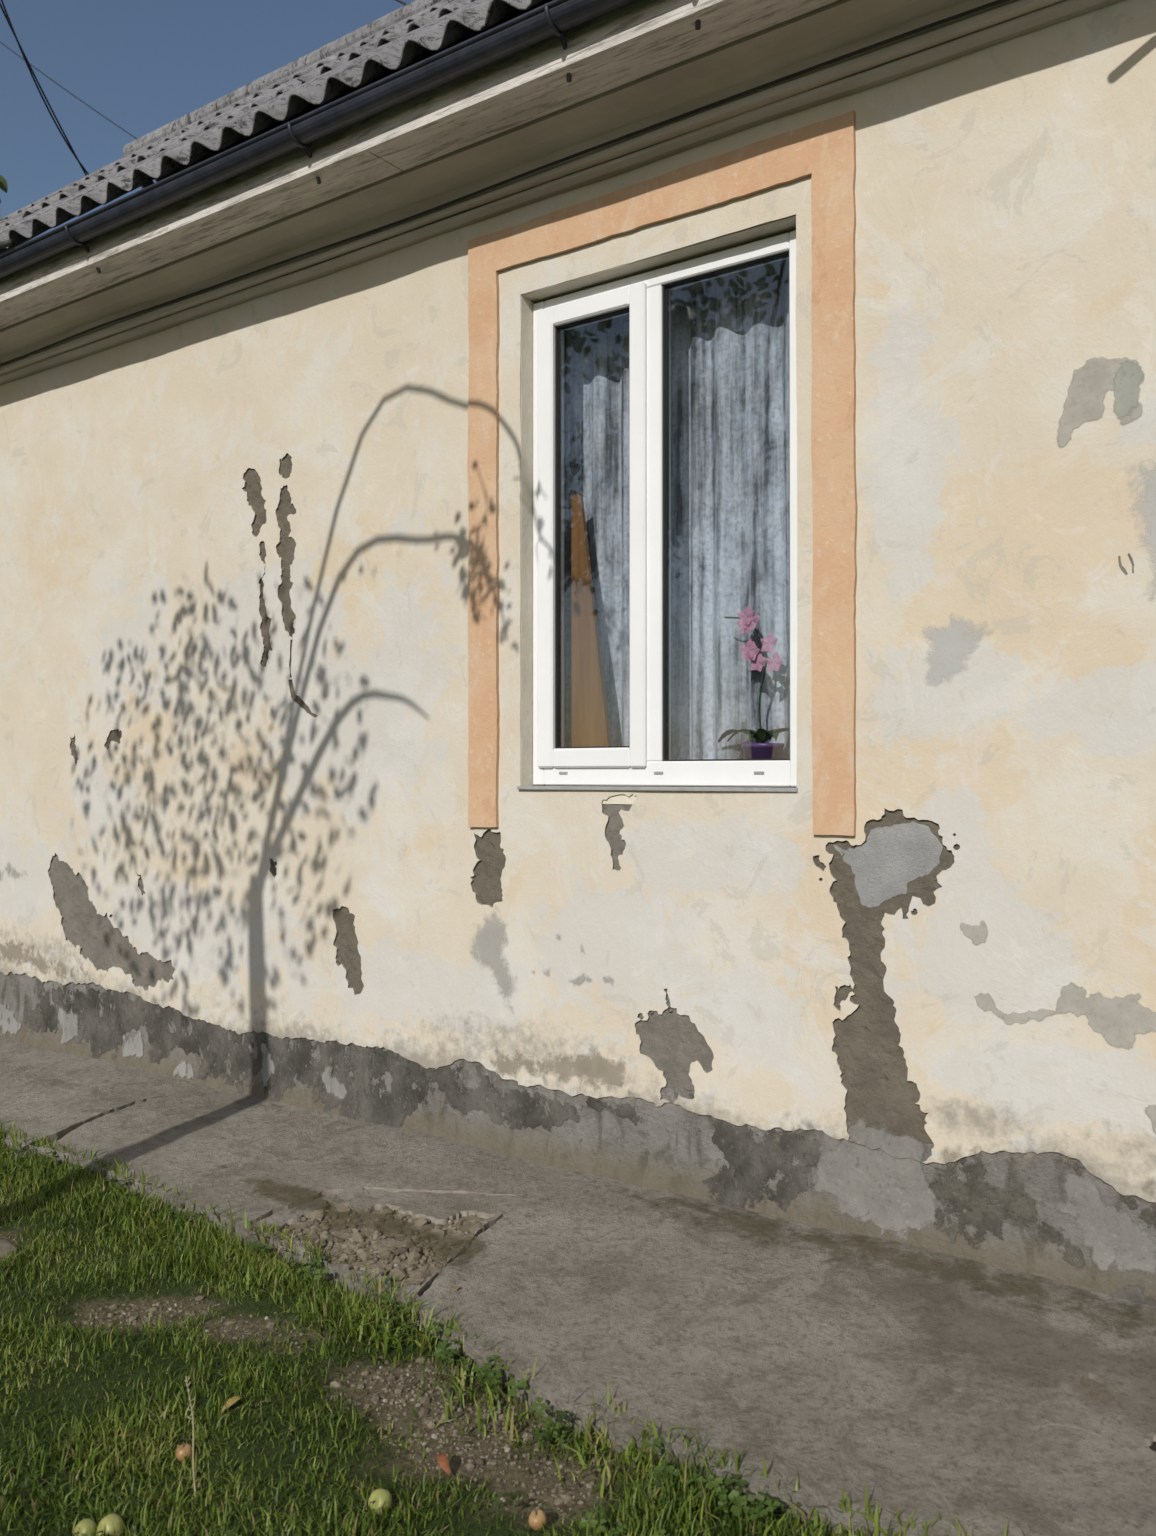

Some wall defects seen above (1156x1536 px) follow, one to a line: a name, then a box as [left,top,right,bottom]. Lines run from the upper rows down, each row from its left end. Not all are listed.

peeling [1057,357,1144,448]
spalling [242,453,318,718]
spalling [471,829,506,908]
spalling [602,794,633,871]
peeling [29,853,642,1131]
spalling [635,989,714,1102]
spalling [813,809,1085,1268]
peeling [975,983,1156,1049]
peeling [1145,1105,1156,1133]
spalling [277,1199,496,1286]
peeling [702,1119,821,1212]
peeling [1103,1181,1156,1228]